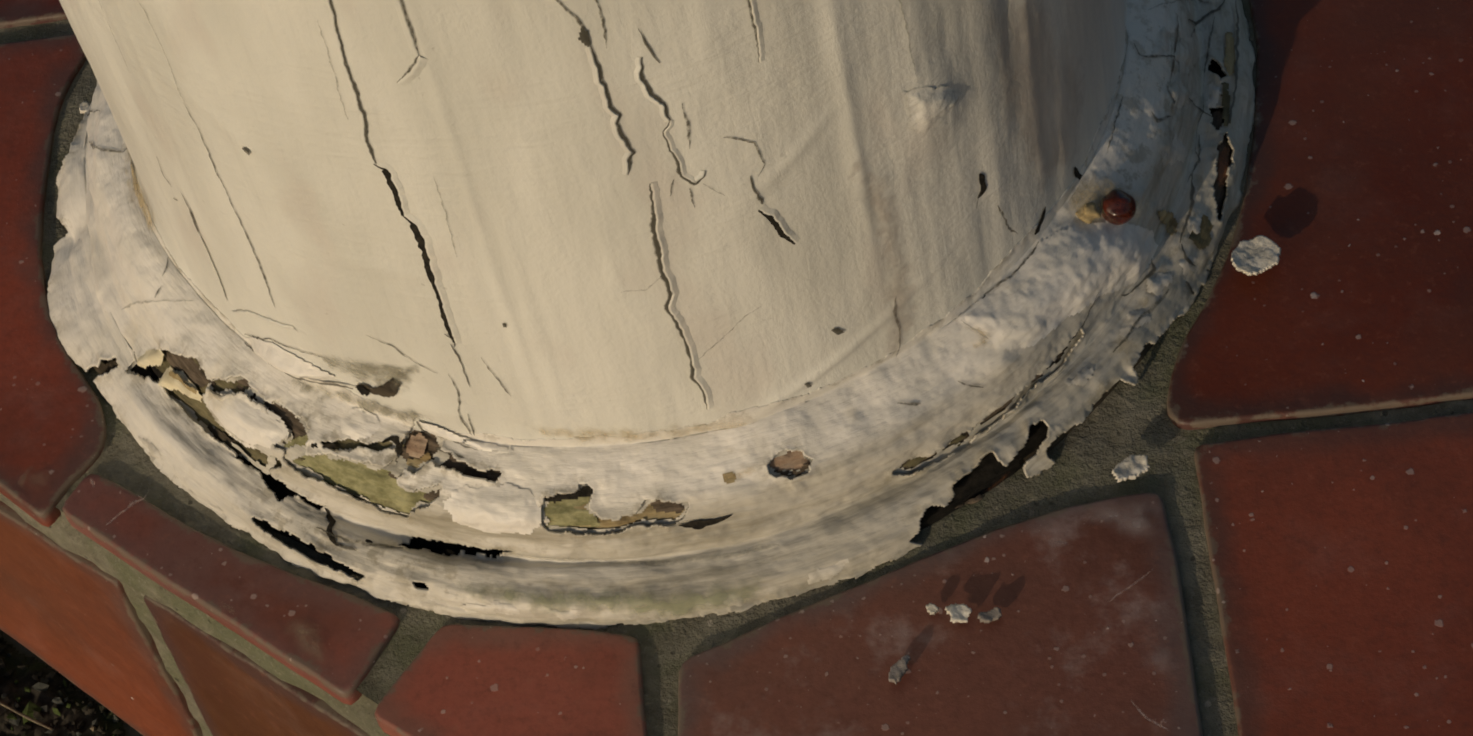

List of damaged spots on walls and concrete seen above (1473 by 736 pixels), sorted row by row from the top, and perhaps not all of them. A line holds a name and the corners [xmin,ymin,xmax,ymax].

crack [162,104,320,357]
crack [325,0,509,434]
crack [556,0,800,410]
peeling [1113,0,1239,368]
peeling [93,349,501,519]
spalling [263,520,333,559]
spalling [405,537,507,559]
peeling [544,607,582,621]
peeling [541,484,732,534]
peeling [807,558,849,585]
peeling [892,330,1094,474]
spalling [920,380,1120,531]